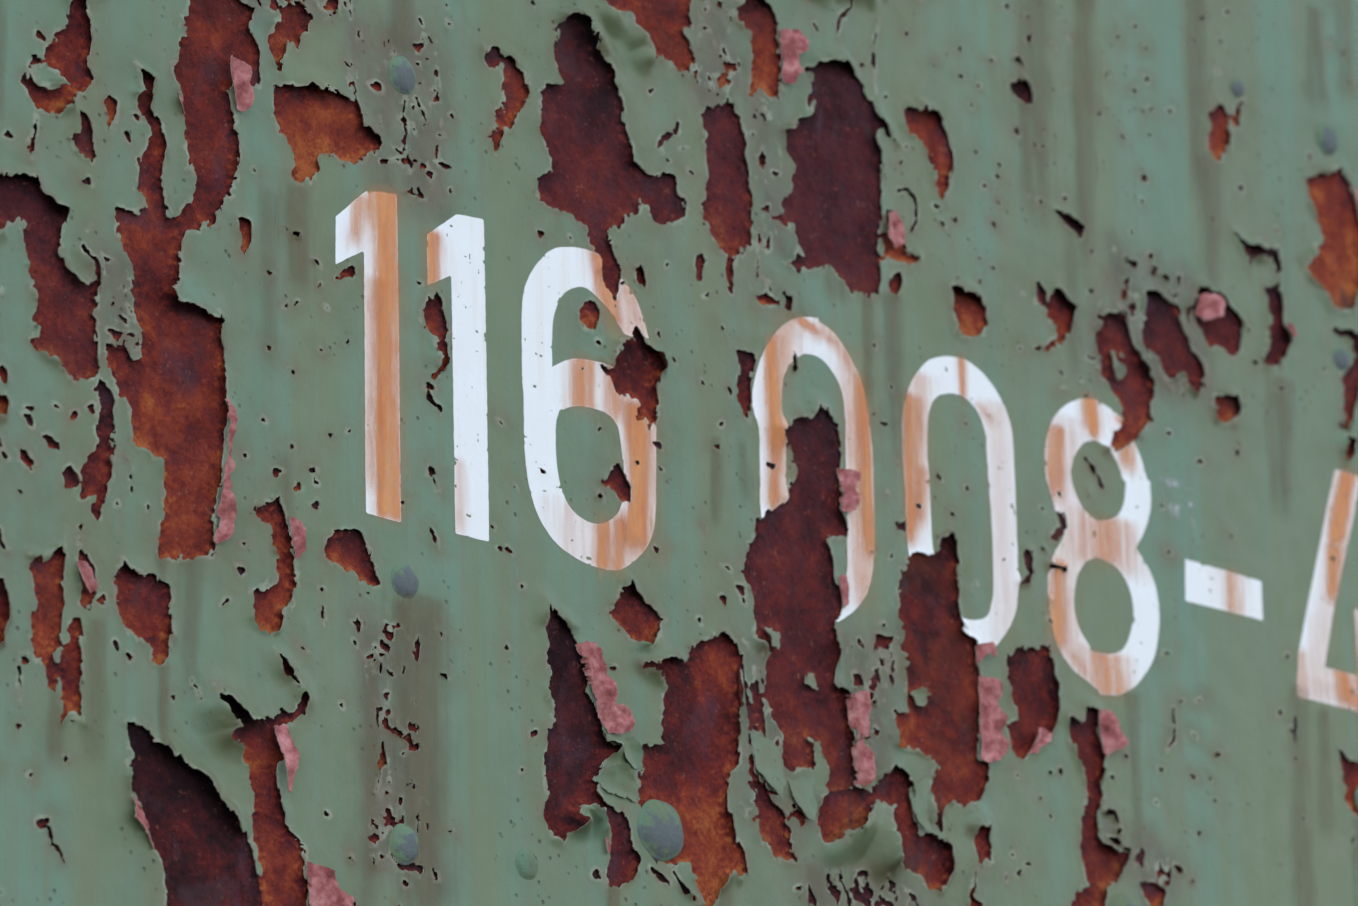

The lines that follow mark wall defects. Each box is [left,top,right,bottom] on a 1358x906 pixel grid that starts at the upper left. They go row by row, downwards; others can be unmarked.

peeling [484,0,954,301]
peeling [0,0,441,724]
rust [354,192,401,520]
rust [592,252,624,321]
rust [573,359,662,569]
peeling [600,326,675,450]
peeling [727,350,756,418]
rust [765,336,785,506]
rust [1083,395,1099,438]
rust [1328,472,1355,599]
peeling [530,404,1182,906]
peeling [127,654,354,906]